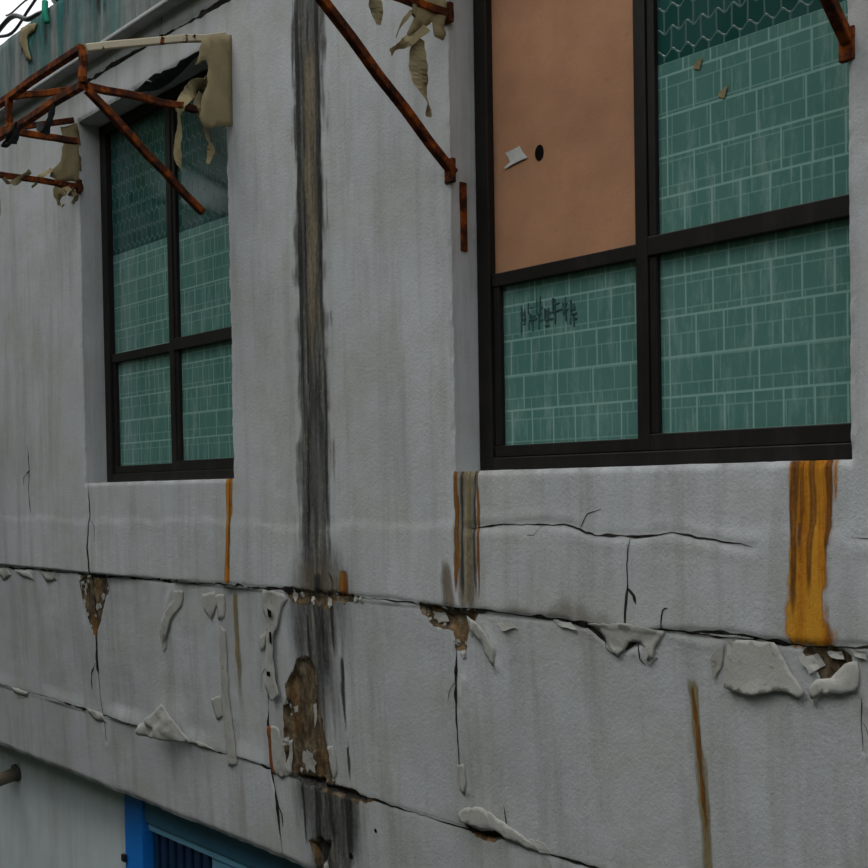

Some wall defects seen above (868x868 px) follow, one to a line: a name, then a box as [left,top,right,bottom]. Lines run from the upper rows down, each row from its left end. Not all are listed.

water stain [291,0,348,732]
spalling [80,574,109,639]
spalling [259,586,373,804]
crack [0,482,752,741]
rust [454,471,480,606]
crack [657,608,868,649]
peeling [710,639,867,703]
rust [785,460,838,648]
water stain [298,781,359,868]
crack [218,752,511,852]
peeling [458,807,552,855]
rust [689,683,712,868]